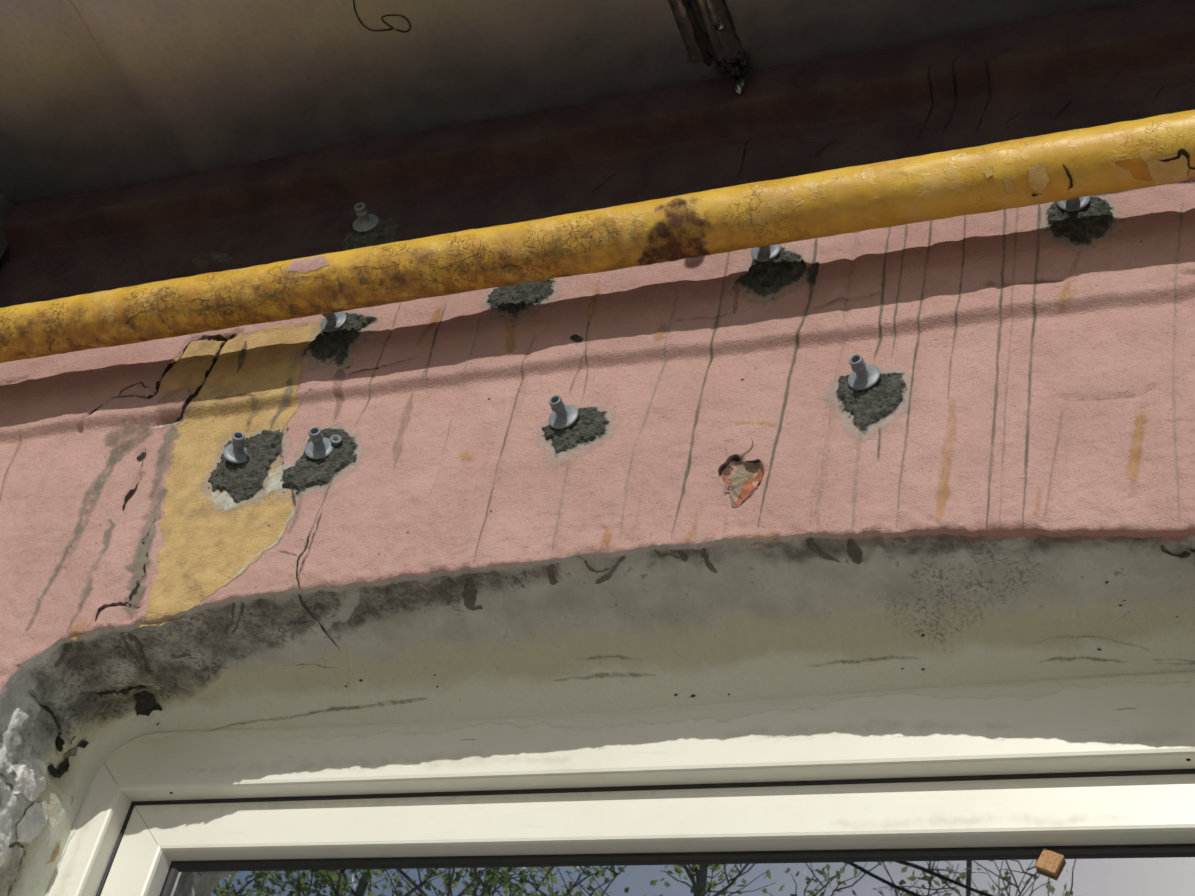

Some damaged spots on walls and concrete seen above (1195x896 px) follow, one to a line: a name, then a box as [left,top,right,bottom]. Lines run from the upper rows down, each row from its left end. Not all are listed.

water stain [27,425,149,629]
water stain [38,640,204,729]
crack [95,518,191,725]
water stain [124,426,178,609]
crack [84,298,251,511]
peeling [139,319,323,627]
water stain [431,574,483,611]
water stain [655,548,717,573]
spalling [713,440,764,508]
water stain [786,538,862,564]
crack [1161,542,1195,558]
peeling [0,710,57,895]